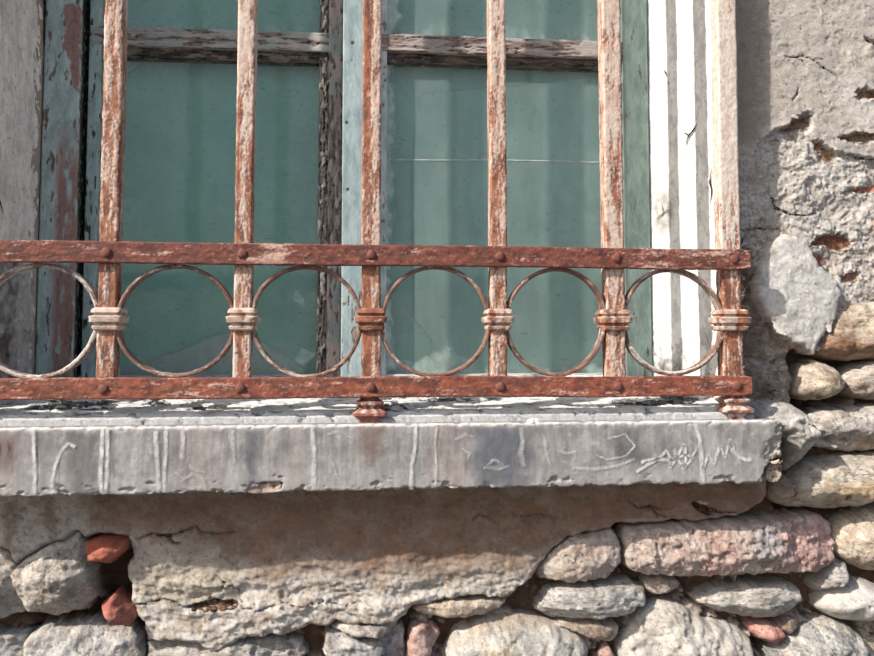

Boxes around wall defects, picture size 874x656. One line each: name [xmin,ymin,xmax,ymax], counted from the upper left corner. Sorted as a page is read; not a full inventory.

spalling [852,87,874,101]
spalling [776,113,839,165]
spalling [840,128,874,144]
flaking render [842,171,874,195]
spalling [809,232,856,269]
spalling [840,270,861,286]